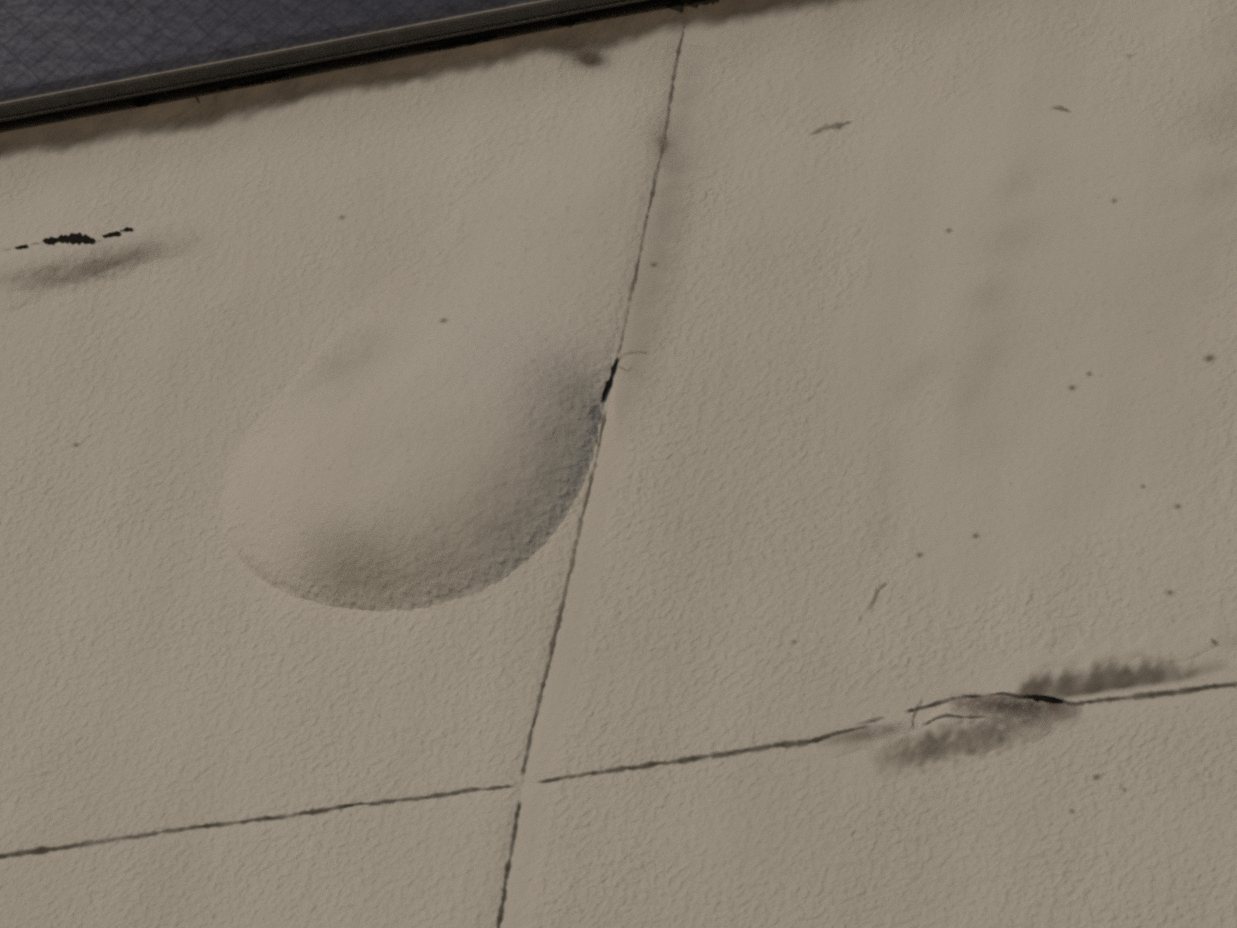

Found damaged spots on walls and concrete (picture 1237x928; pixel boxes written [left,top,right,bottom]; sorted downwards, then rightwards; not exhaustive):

crack [631,24,684,288]
spalling [43,227,133,244]
crack [129,338,862,928]
peeling [820,691,1077,769]
crack [1068,683,1235,704]
crack [0,843,84,858]